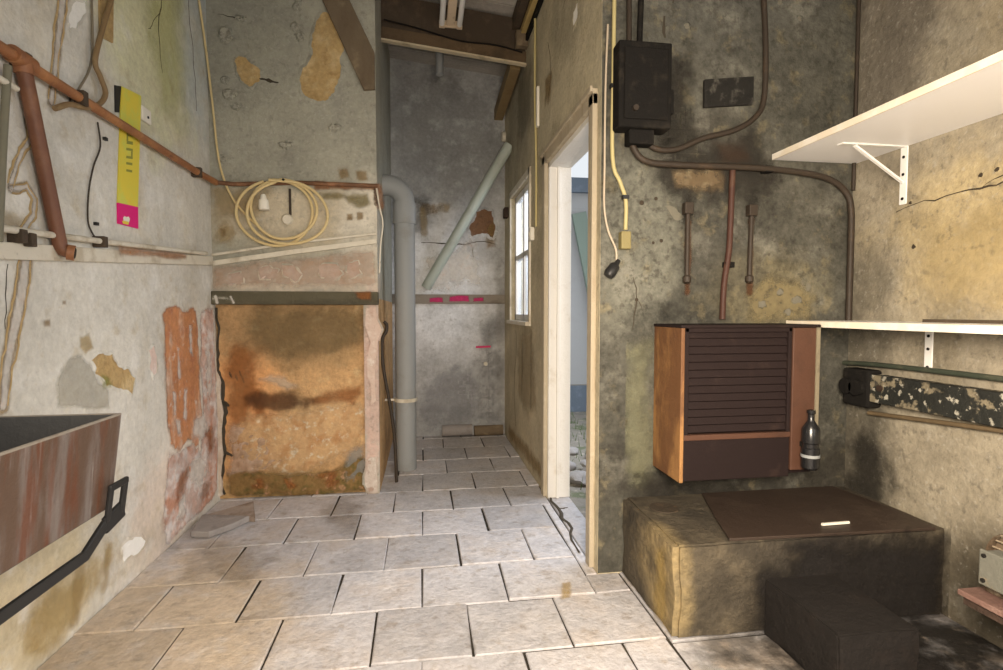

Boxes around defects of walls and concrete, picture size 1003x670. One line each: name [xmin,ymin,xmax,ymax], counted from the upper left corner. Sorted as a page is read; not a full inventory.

spalling [232,54,279,90]
spalling [295,9,346,105]
crack [897,175,1003,212]
spalling [466,207,499,241]
spalling [89,350,136,397]
water stain [230,349,263,428]
spalling [163,305,384,542]
crack [550,497,581,553]